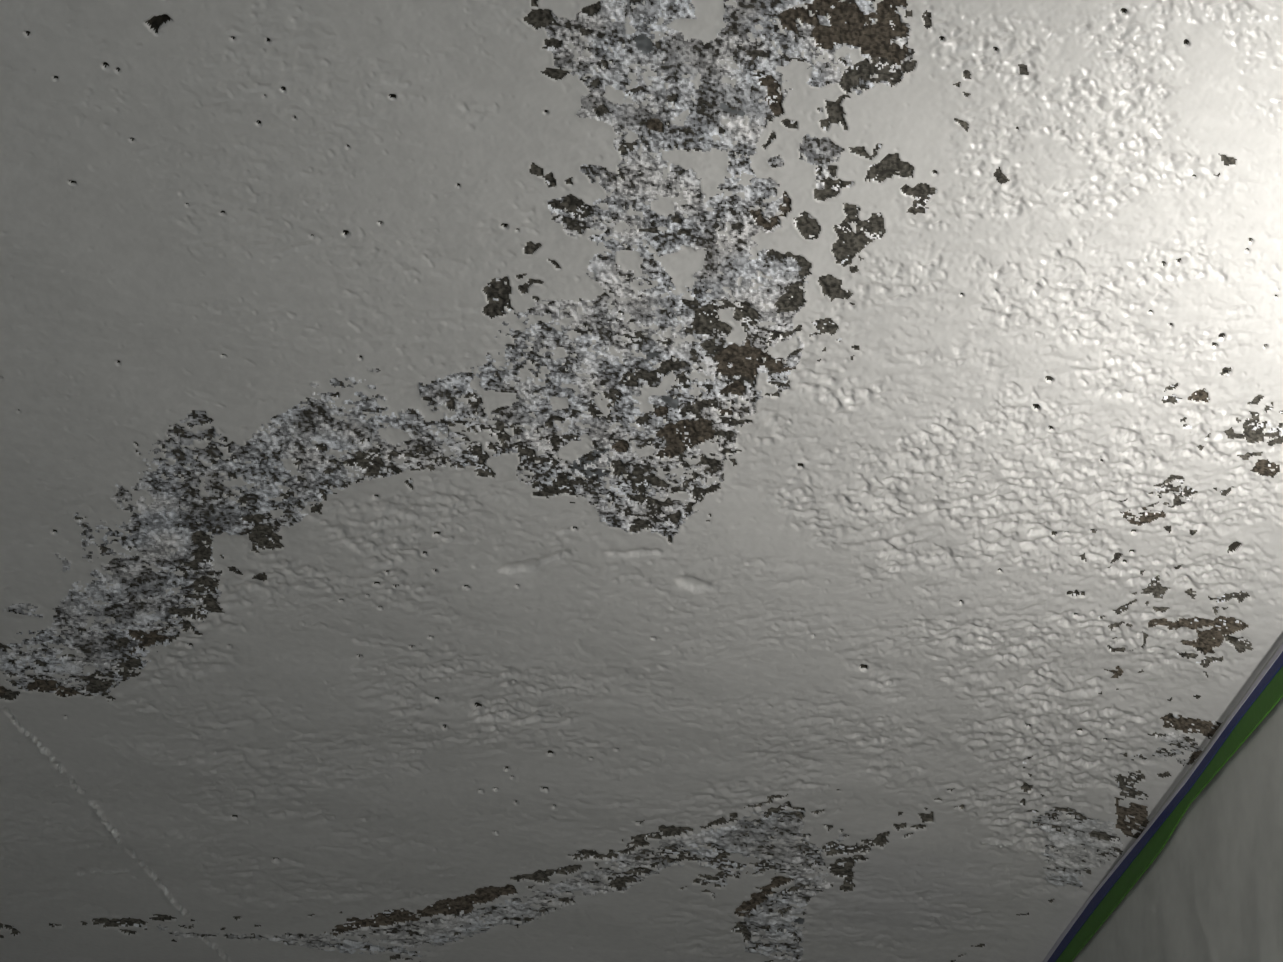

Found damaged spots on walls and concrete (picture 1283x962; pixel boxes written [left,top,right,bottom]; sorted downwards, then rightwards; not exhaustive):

peeling [0,0,938,702]
peeling [1162,383,1210,429]
peeling [1197,395,1283,478]
peeling [1119,475,1233,533]
peeling [1098,570,1253,694]
peeling [1020,697,1223,903]
peeling [0,923,20,938]
peeling [81,788,964,962]